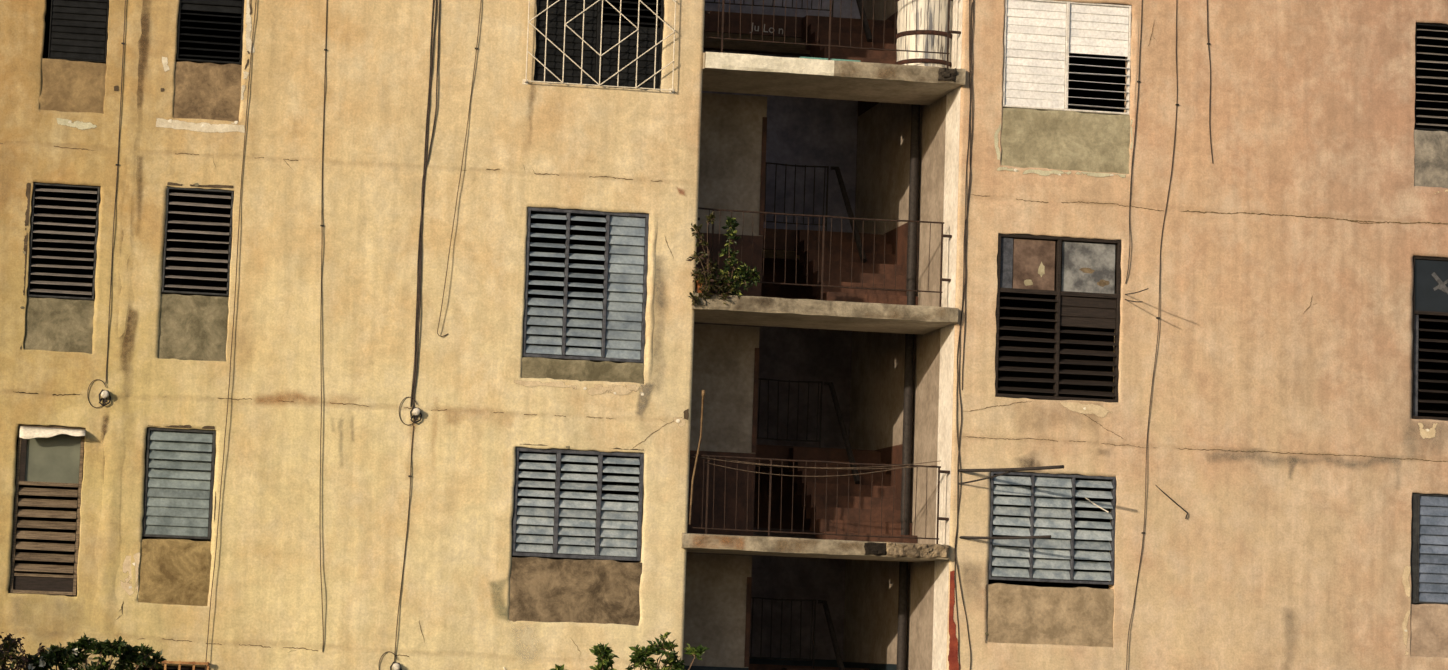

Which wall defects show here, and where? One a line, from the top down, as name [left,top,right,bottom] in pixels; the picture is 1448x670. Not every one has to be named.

flaking render [241,0,255,100]
flaking render [156,117,245,133]
crack [972,194,1448,225]
crack [966,401,1448,462]
flaking render [1418,423,1438,439]
spalling [864,542,949,559]